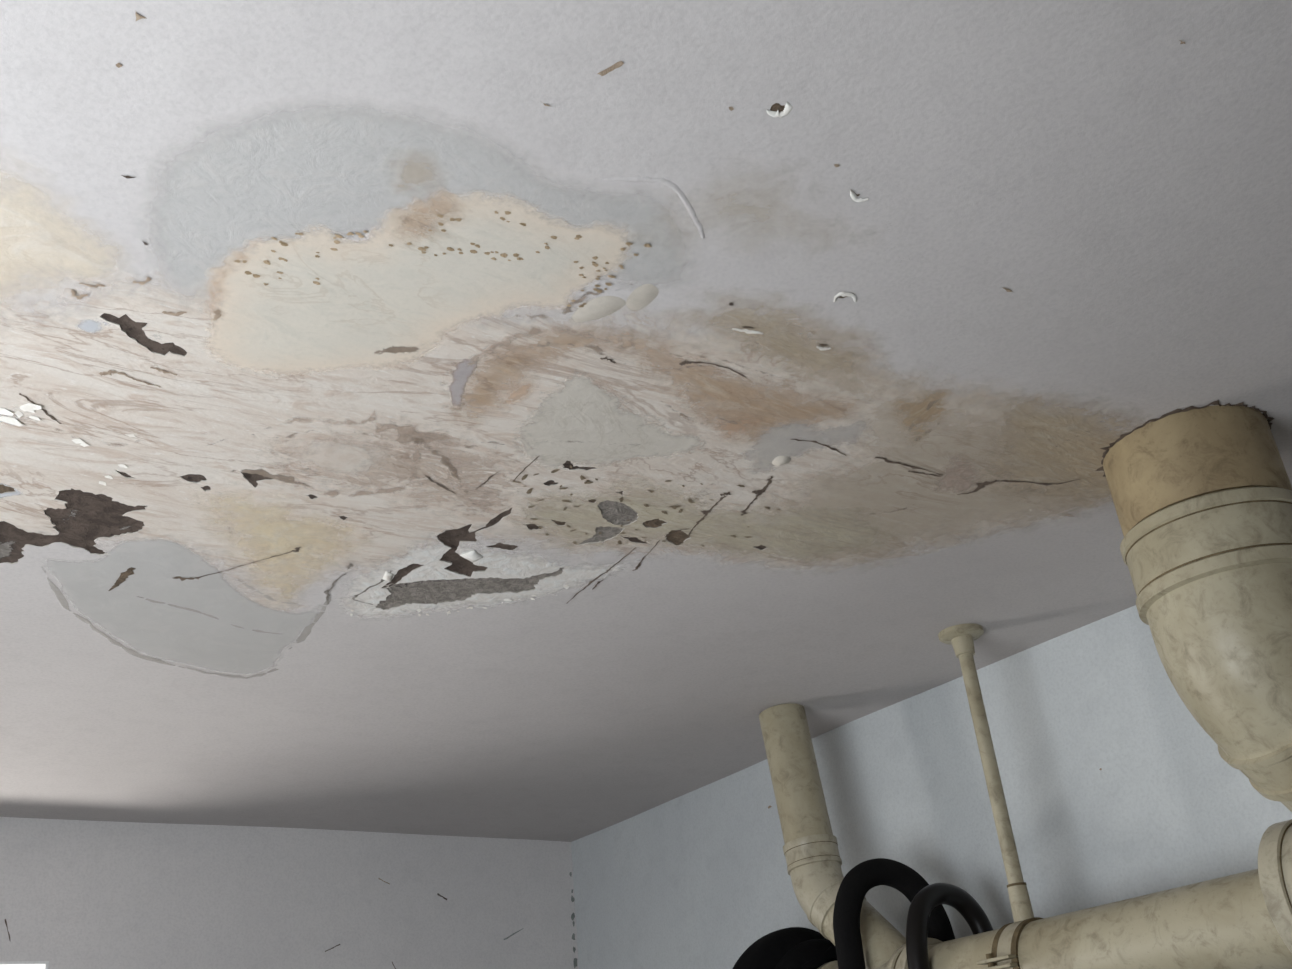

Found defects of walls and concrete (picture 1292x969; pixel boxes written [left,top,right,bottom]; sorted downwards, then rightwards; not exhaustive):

spalling [766,102,793,118]
peeling [208,193,627,373]
spalling [79,313,187,356]
water stain [0,110,1125,610]
peeling [0,403,42,426]
crack [790,400,1275,495]
spalling [579,491,690,546]
peeling [0,461,620,679]